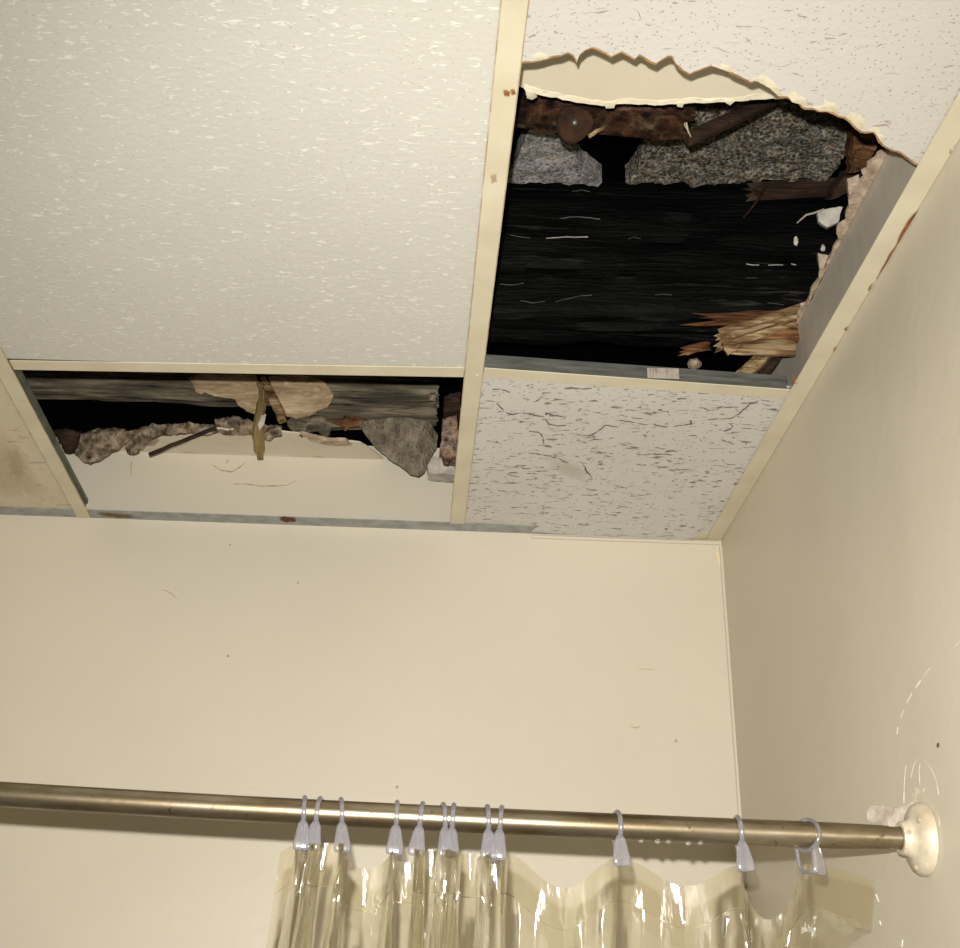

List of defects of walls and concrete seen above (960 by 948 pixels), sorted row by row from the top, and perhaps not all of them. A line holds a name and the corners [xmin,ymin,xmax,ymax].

spalling [524,76,889,324]
corrosion [881,216,913,271]
peeling [721,342,740,356]
spalling [139,427,384,460]
crack [489,389,758,477]
peeling [866,802,913,827]